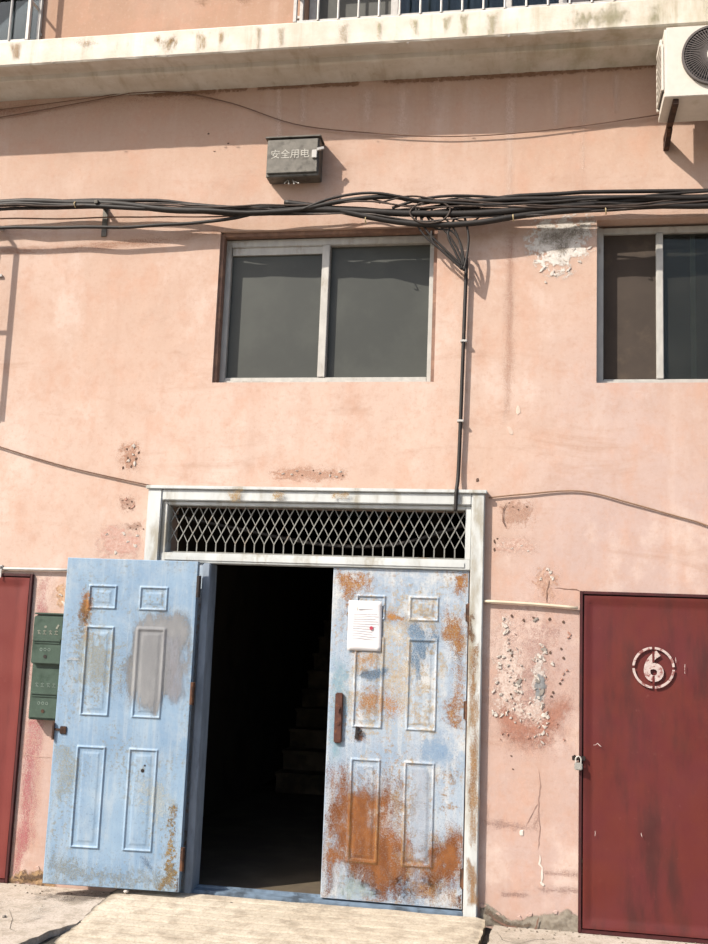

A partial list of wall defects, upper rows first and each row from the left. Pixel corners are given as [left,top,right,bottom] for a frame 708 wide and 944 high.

water stain [567,1,632,31]
peeling [522,214,599,283]
spalling [118,442,143,470]
rust [77,589,93,625]
rust [336,568,376,616]
rust [450,572,468,597]
peeling [484,567,584,770]
rust [321,608,481,909]
rust [156,803,178,892]
crack [527,775,541,851]